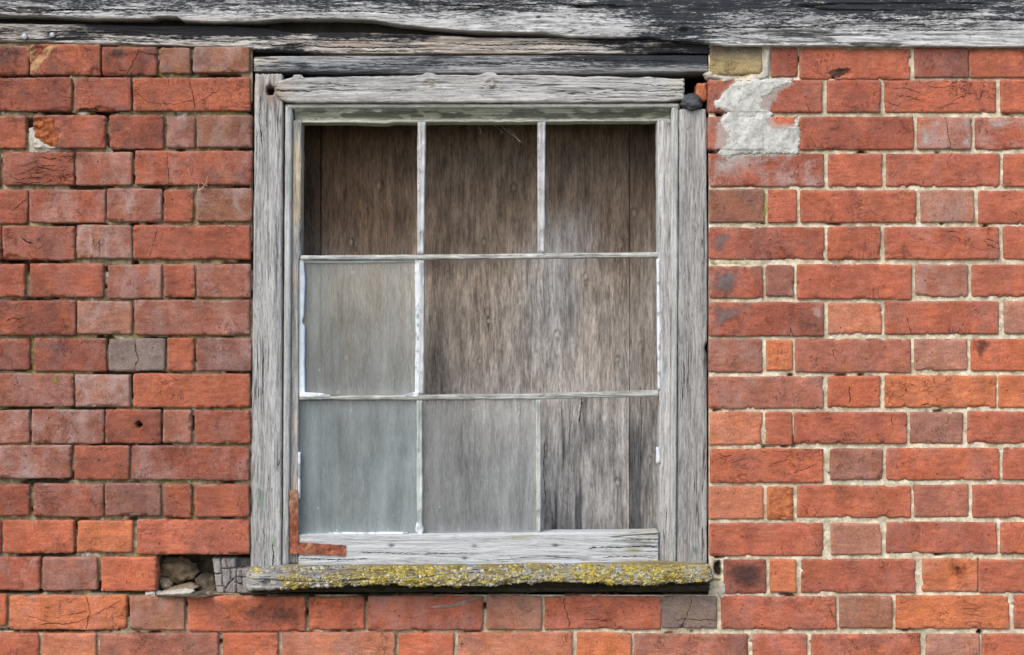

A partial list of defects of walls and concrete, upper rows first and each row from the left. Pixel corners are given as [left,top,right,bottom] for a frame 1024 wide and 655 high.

spalling [34,116,59,146]